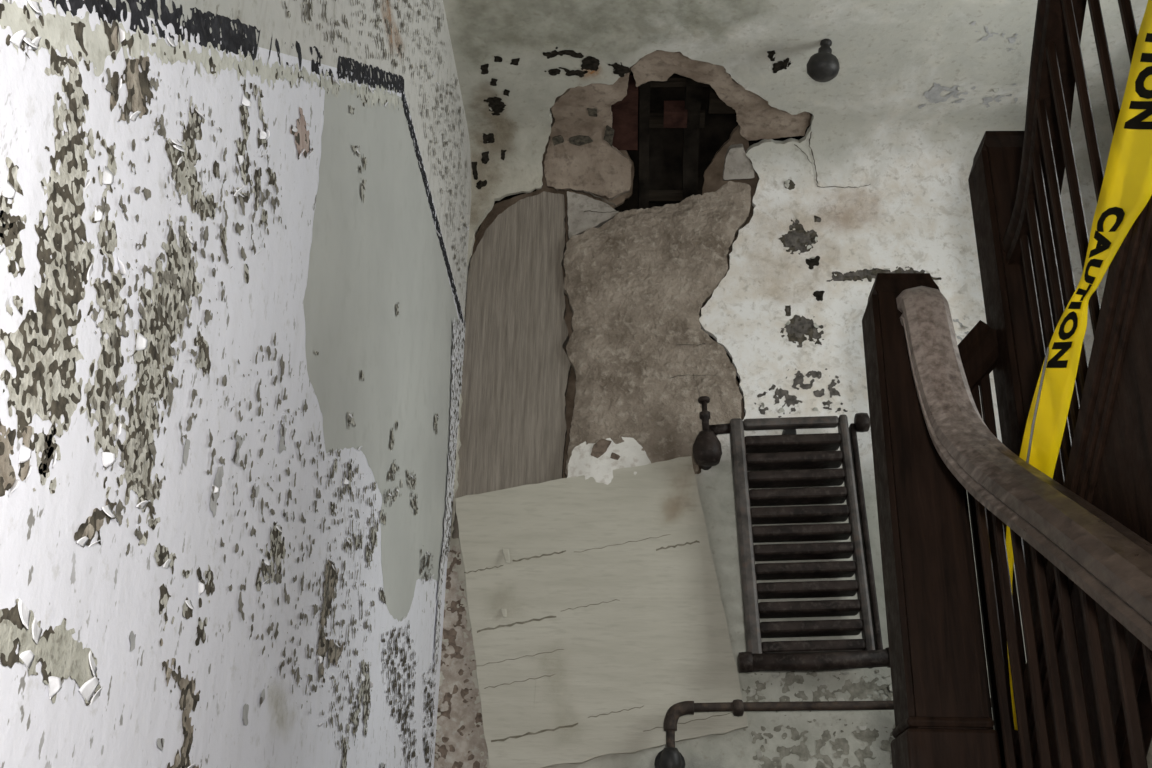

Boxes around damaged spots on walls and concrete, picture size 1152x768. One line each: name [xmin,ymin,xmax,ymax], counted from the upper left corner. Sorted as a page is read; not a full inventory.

peeling [0,0,847,768]
peeling [742,669,895,768]